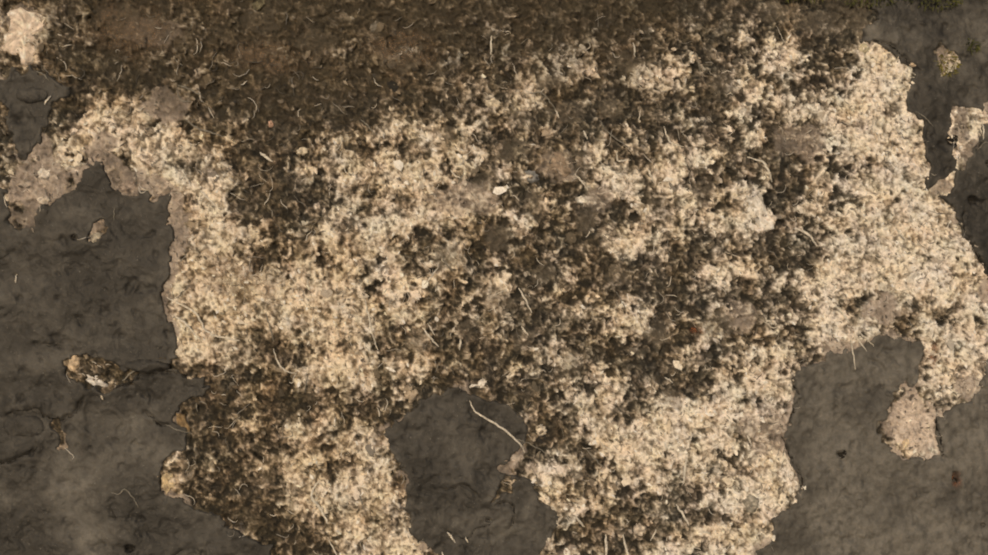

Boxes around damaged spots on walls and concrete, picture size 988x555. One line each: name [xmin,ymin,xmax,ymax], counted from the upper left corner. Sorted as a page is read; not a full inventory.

spalling [933,42,960,77]
spalling [71,209,115,243]
spalling [63,354,140,400]